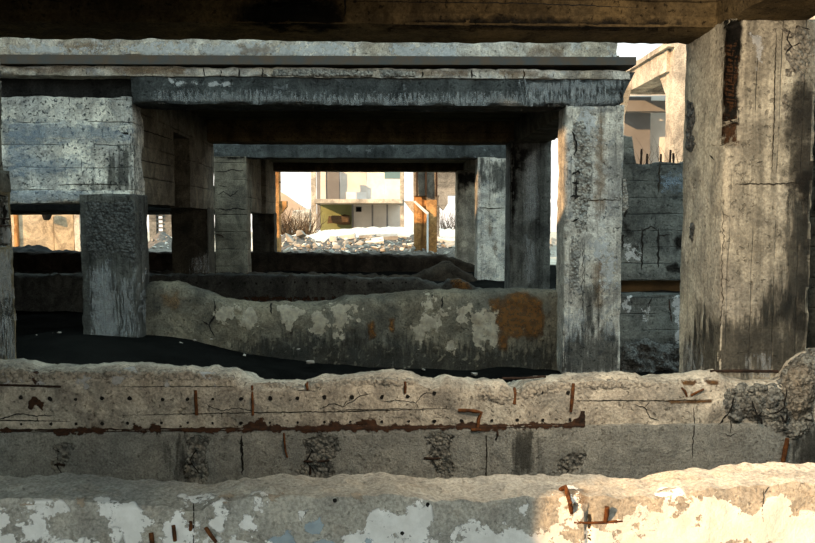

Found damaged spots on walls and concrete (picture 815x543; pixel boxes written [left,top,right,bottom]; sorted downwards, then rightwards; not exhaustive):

crack [737,27,810,185]
crack [720,207,729,326]
leakage [0,293,15,360]
rust [489,292,545,350]
crack [0,413,70,422]
rust [53,426,108,436]
rust [133,423,162,435]
rust [178,416,586,435]
peeling [0,499,100,543]
peeling [93,491,268,543]
peeling [298,499,440,543]
peeling [450,485,815,543]